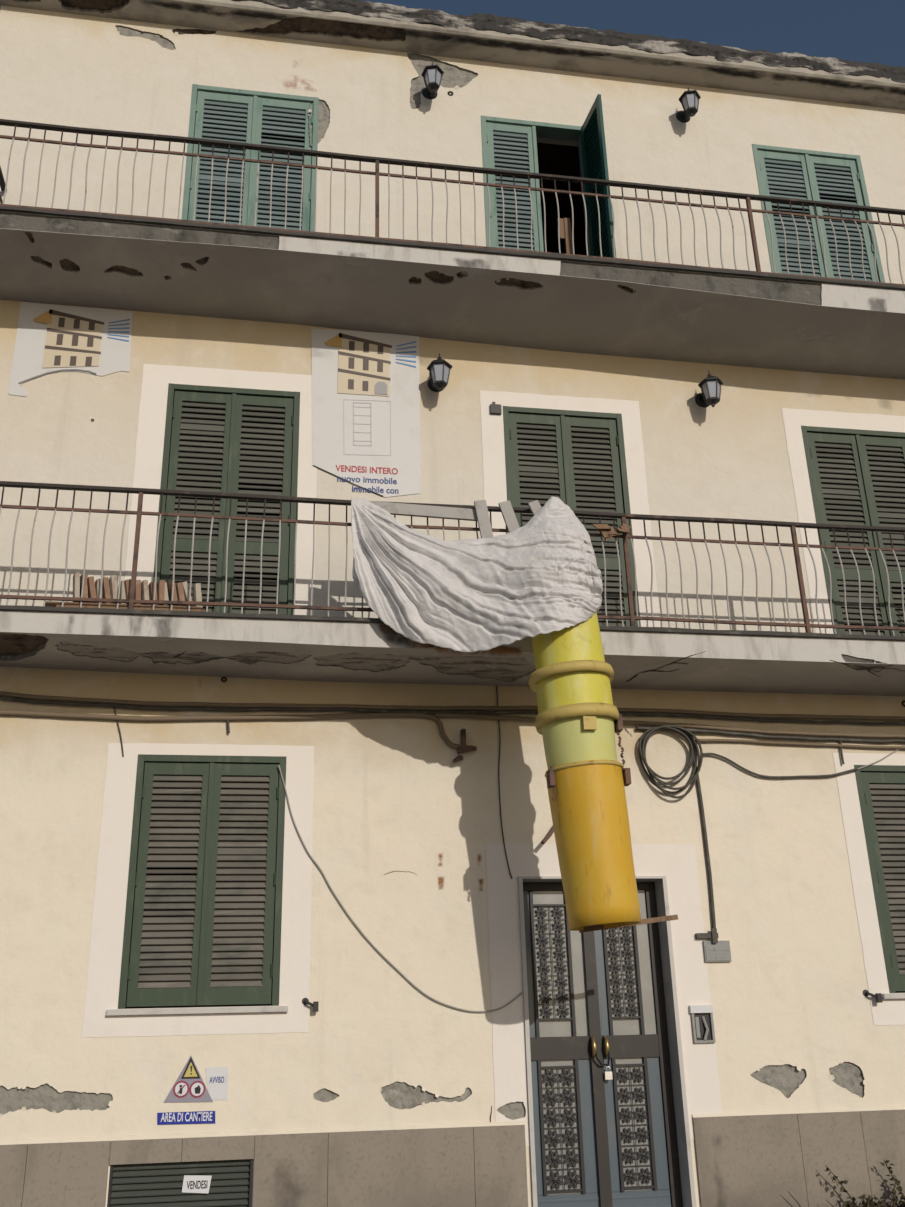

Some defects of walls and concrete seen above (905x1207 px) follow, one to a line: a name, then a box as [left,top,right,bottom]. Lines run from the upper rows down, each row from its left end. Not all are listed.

spalling [58,0,216,50]
spalling [235,17,478,109]
flaking render [0,211,279,273]
spalling [409,271,469,285]
spalling [0,633,536,682]
spalling [842,654,893,672]
spalling [0,1083,114,1116]
spalling [313,1088,339,1102]
spalling [380,1081,472,1109]
spalling [497,1102,526,1120]
spalling [751,1064,807,1098]
spalling [829,1062,865,1098]